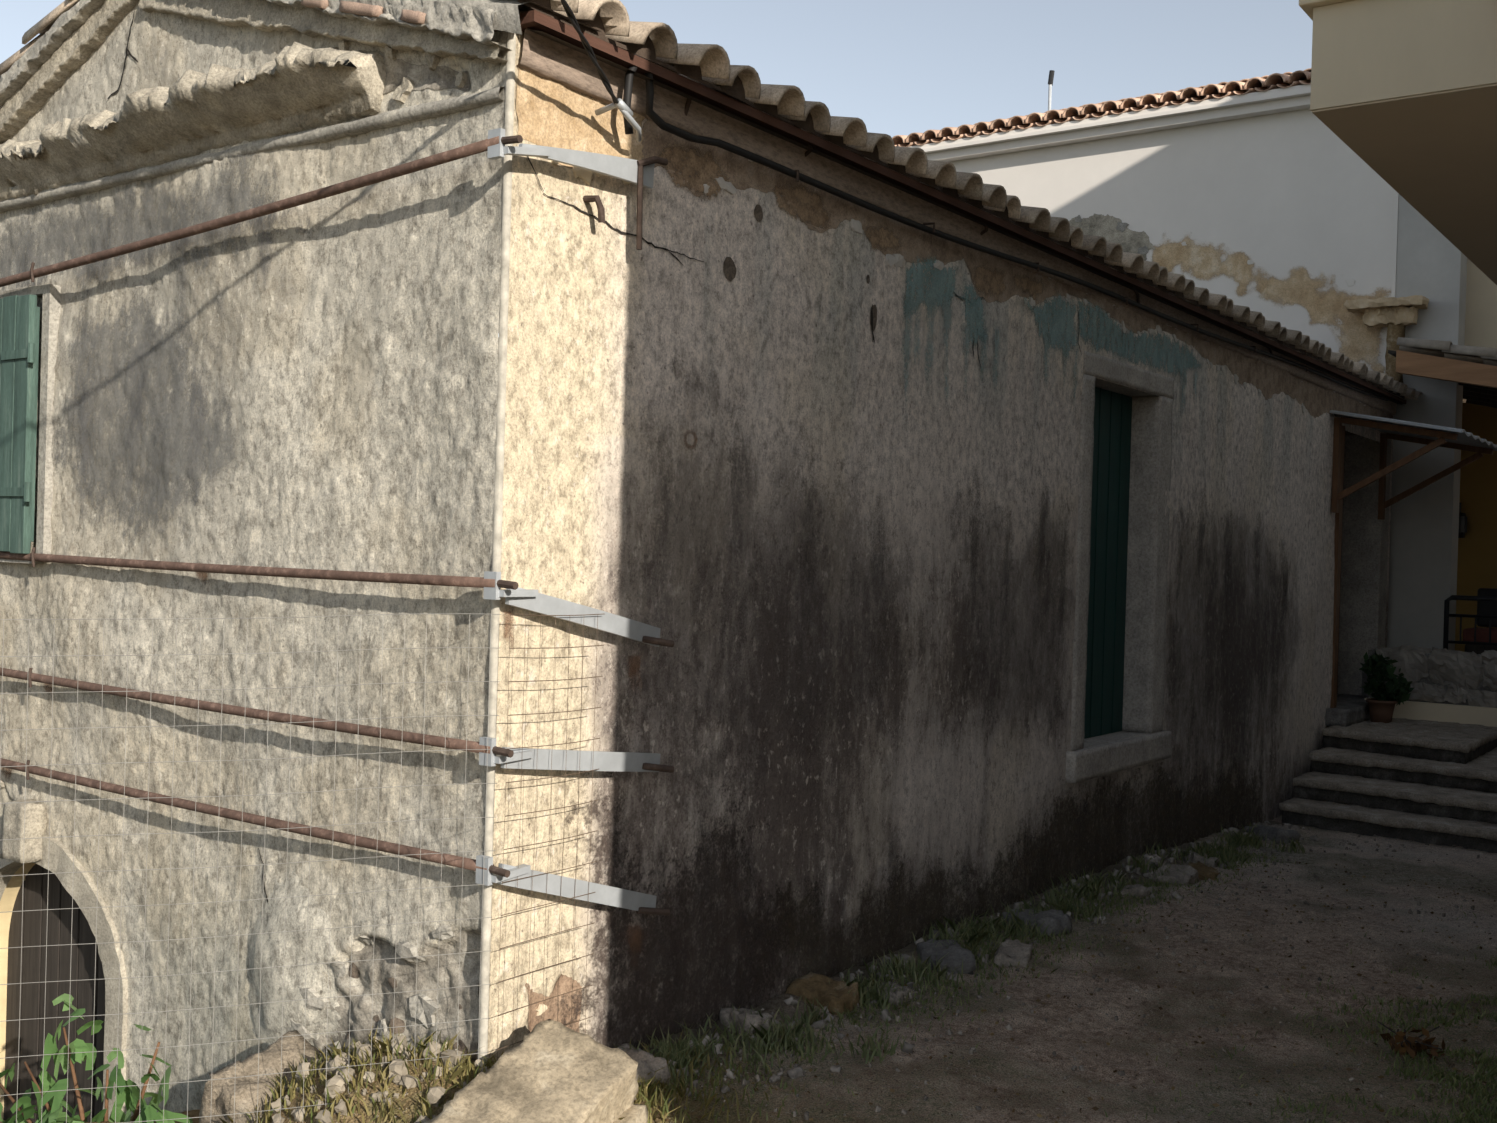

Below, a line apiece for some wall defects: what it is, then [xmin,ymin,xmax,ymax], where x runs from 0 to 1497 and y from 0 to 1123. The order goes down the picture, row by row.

peeling [516,67,1393,431]
damp [550,781,818,1049]